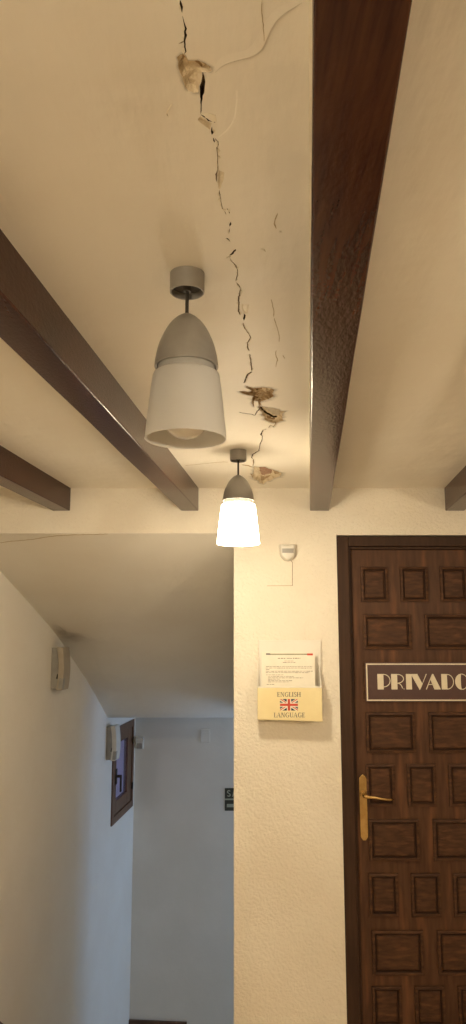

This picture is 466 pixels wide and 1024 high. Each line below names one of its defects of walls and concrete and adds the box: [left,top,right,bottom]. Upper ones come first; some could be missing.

crack [178,0,187,54]
spalling [177,54,216,130]
crack [202,115,285,383]
spalling [239,386,285,426]
spalling [242,460,281,484]